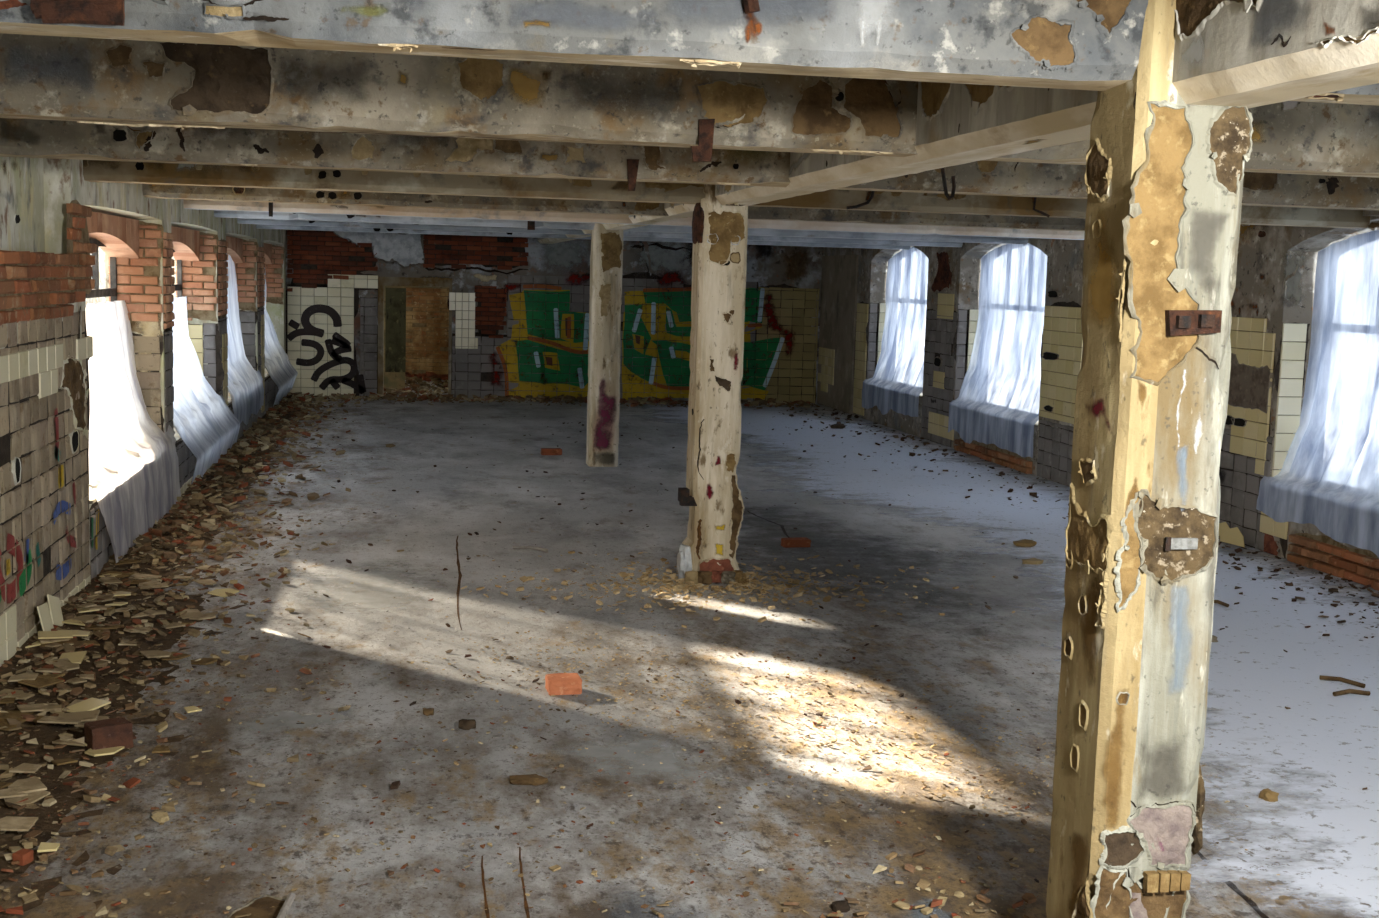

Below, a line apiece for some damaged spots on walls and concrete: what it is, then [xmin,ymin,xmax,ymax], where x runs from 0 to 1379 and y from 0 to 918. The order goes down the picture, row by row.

spalling [0,0,275,143]
corrosion [745,13,762,43]
spalling [791,78,904,155]
spalling [920,81,1015,121]
spalling [1009,0,1133,71]
flaking render [0,200,529,338]
spalling [633,146,751,266]
spalling [1085,138,1113,240]
spalling [1115,100,1280,386]
peeling [1225,353,1273,427]
spalling [1065,458,1219,629]
spalling [1072,800,1196,918]